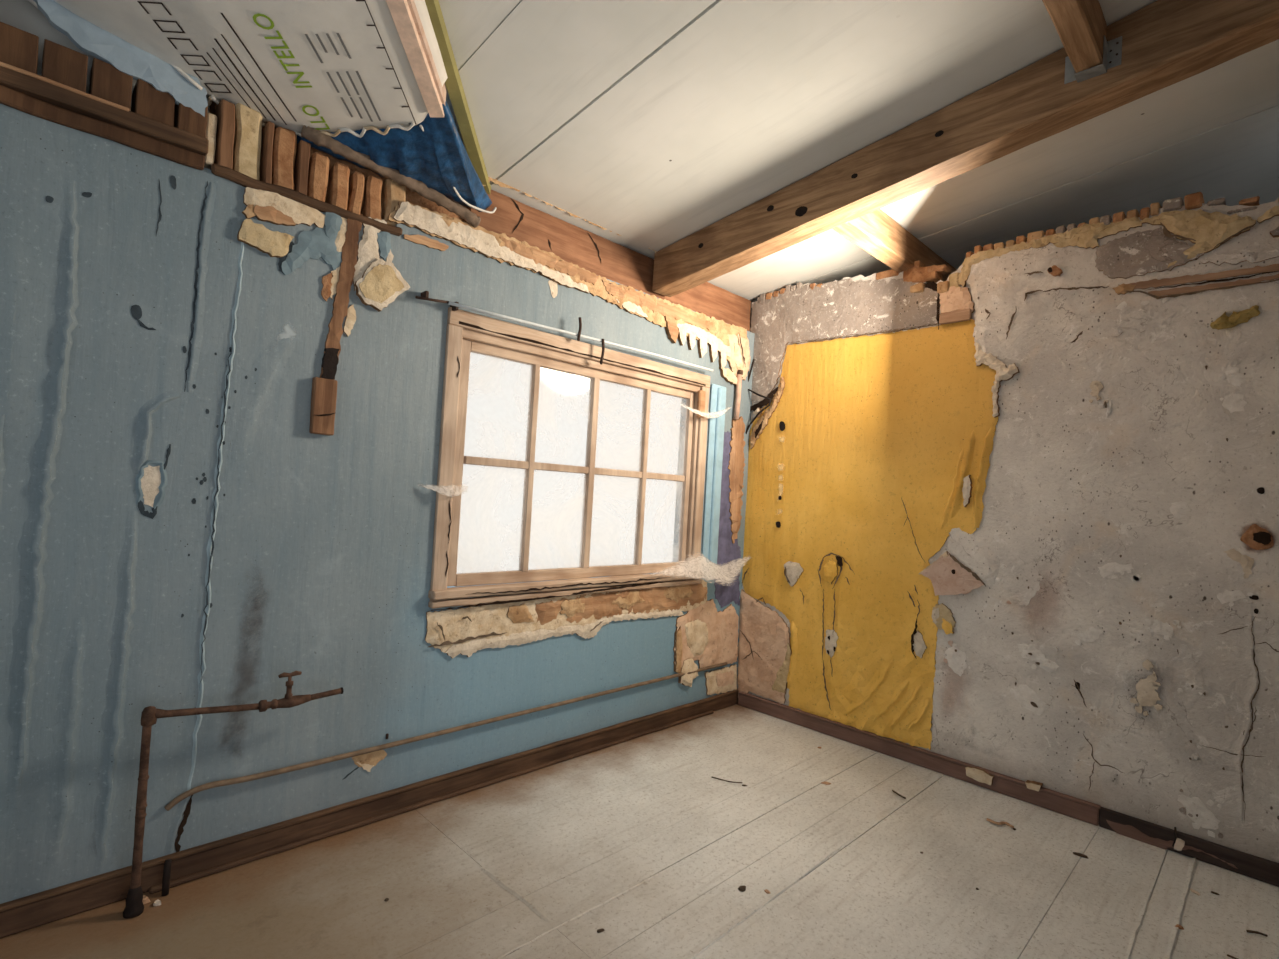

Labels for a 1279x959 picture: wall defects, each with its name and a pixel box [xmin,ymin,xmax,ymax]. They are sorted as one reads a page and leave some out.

spalling [966,192,1279,269]
spalling [237,187,748,369]
spalling [759,282,823,304]
spalling [939,286,975,313]
spalling [135,444,171,519]
spalling [425,568,792,704]
crack [1202,615,1279,821]